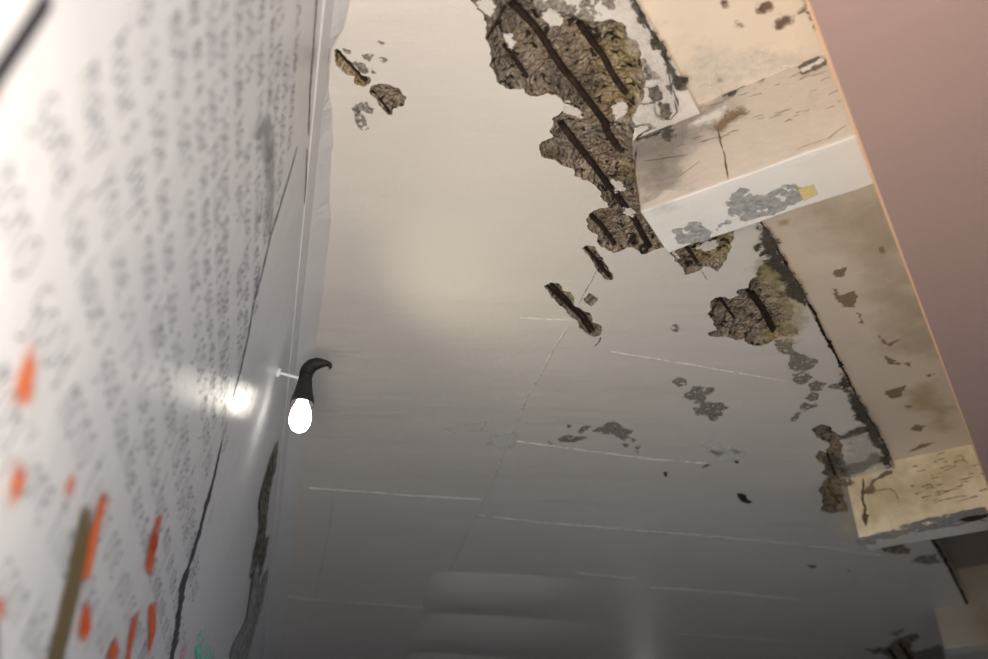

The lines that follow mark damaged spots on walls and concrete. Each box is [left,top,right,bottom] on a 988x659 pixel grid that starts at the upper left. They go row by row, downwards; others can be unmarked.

crack [309,0,317,125]
spalling [334,48,407,130]
damp [691,86,744,125]
spalling [471,0,802,280]
damp [636,125,674,141]
spalling [544,283,602,337]
spalling [708,277,842,422]
peeling [673,378,728,421]
peeling [548,422,641,452]
spalling [812,409,893,513]
spalling [864,629,947,659]